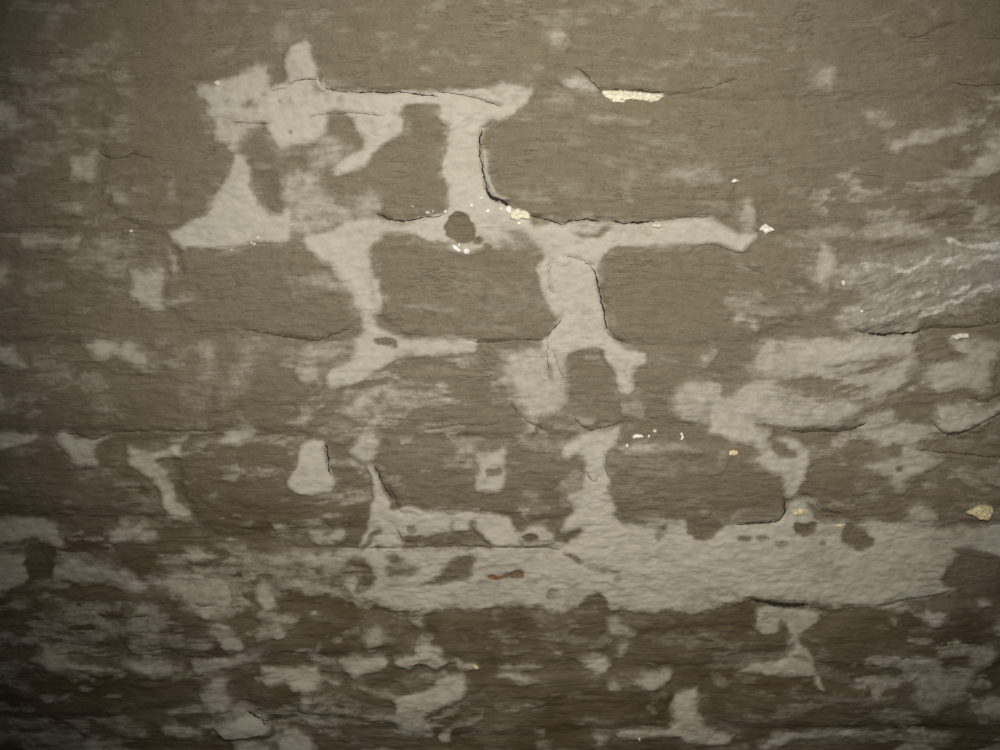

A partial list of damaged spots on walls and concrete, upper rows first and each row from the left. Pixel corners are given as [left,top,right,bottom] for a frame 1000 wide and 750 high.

crack [574,66,735,95]
peeling [602,90,664,103]
crack [272,77,708,225]
spalling [426,197,531,254]
crack [548,256,622,342]
crack [288,466,560,550]
spalling [684,514,724,541]
crack [736,494,838,525]
spalling [835,521,875,552]
peeling [966,505,994,521]
spalling [422,553,478,586]
corrosion [488,568,525,580]